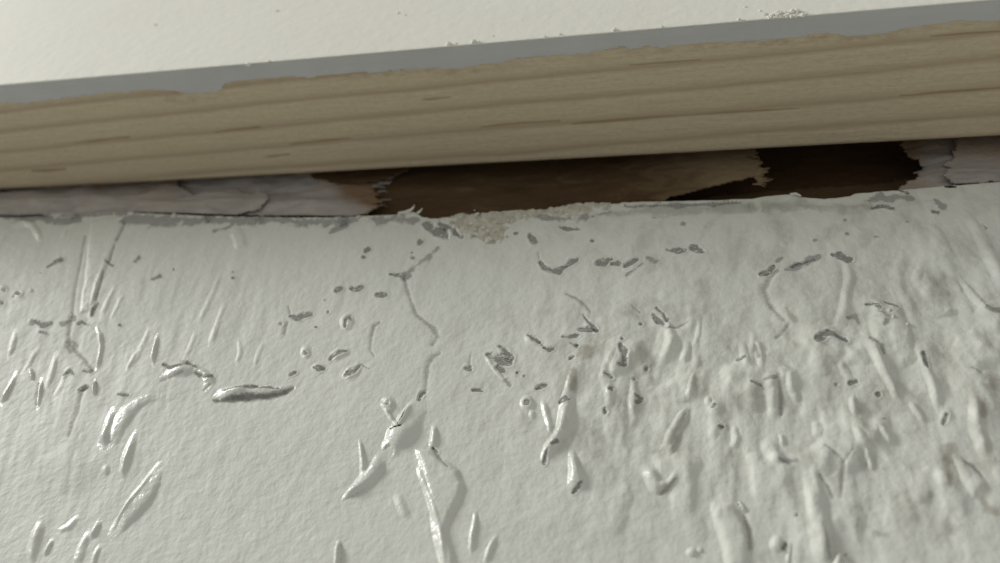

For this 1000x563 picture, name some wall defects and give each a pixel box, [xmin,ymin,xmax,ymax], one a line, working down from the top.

peeling [349,216,377,259]
crack [400,247,439,279]
flaking render [411,202,612,259]
peeling [539,258,579,275]
peeling [596,256,658,276]
peeling [666,244,705,254]
peeling [339,313,354,331]
peeling [522,331,553,354]
peeling [562,314,599,360]
peeling [300,343,364,384]
peeling [483,345,525,387]
peeling [598,307,679,435]